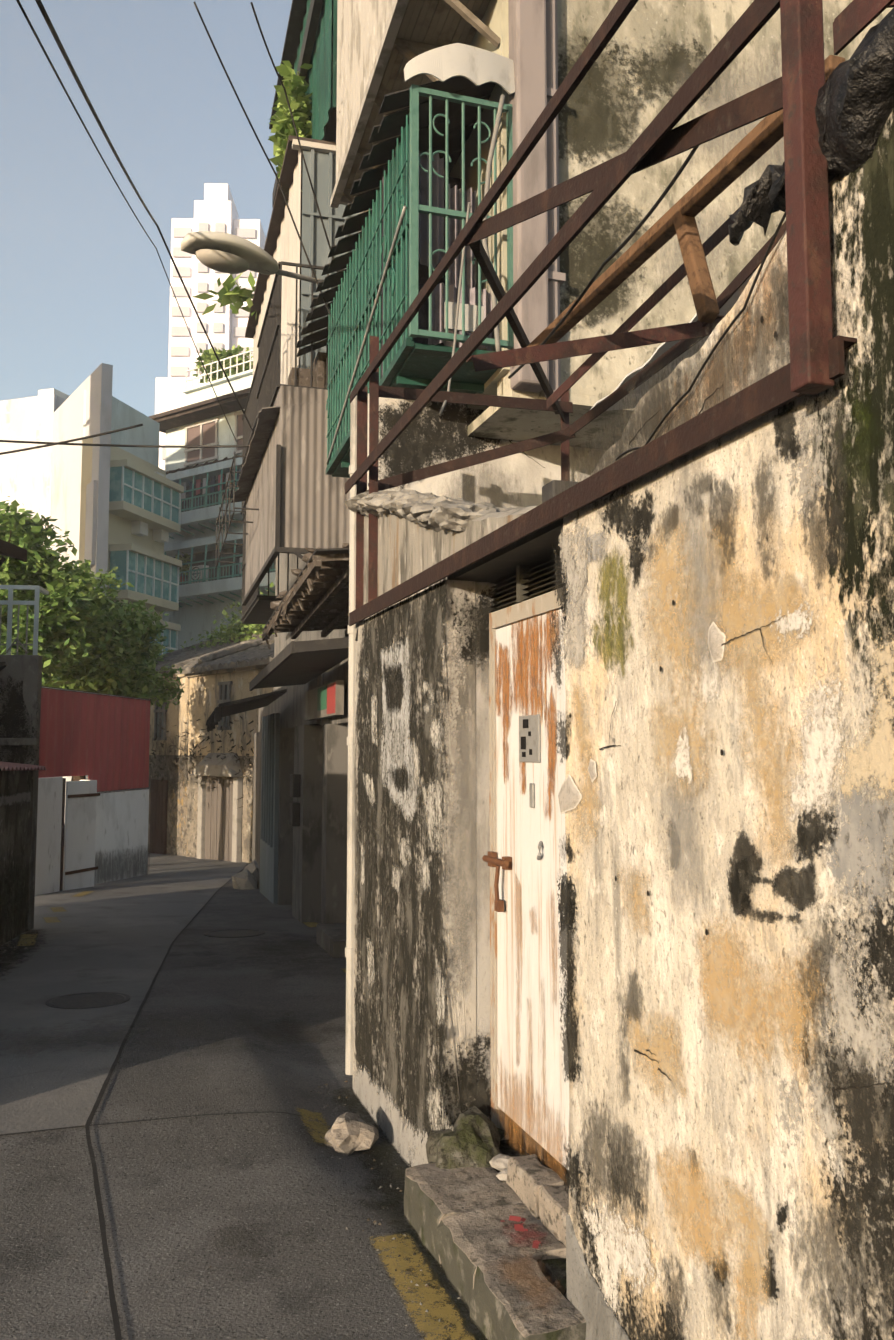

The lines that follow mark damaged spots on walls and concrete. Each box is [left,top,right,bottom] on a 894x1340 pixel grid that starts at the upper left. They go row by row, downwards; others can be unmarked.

water stain [558,35,707,166]
corrosion [495,609,559,820]
water stain [550,546,569,689]
water stain [595,472,736,587]
water stain [562,259,789,492]
water stain [751,107,894,736]
water stain [354,578,497,1143]
water stain [557,834,582,1083]
water stain [727,801,837,923]
water stain [776,770,894,1340]
water stain [559,1101,687,1340]
water stain [762,1248,779,1302]